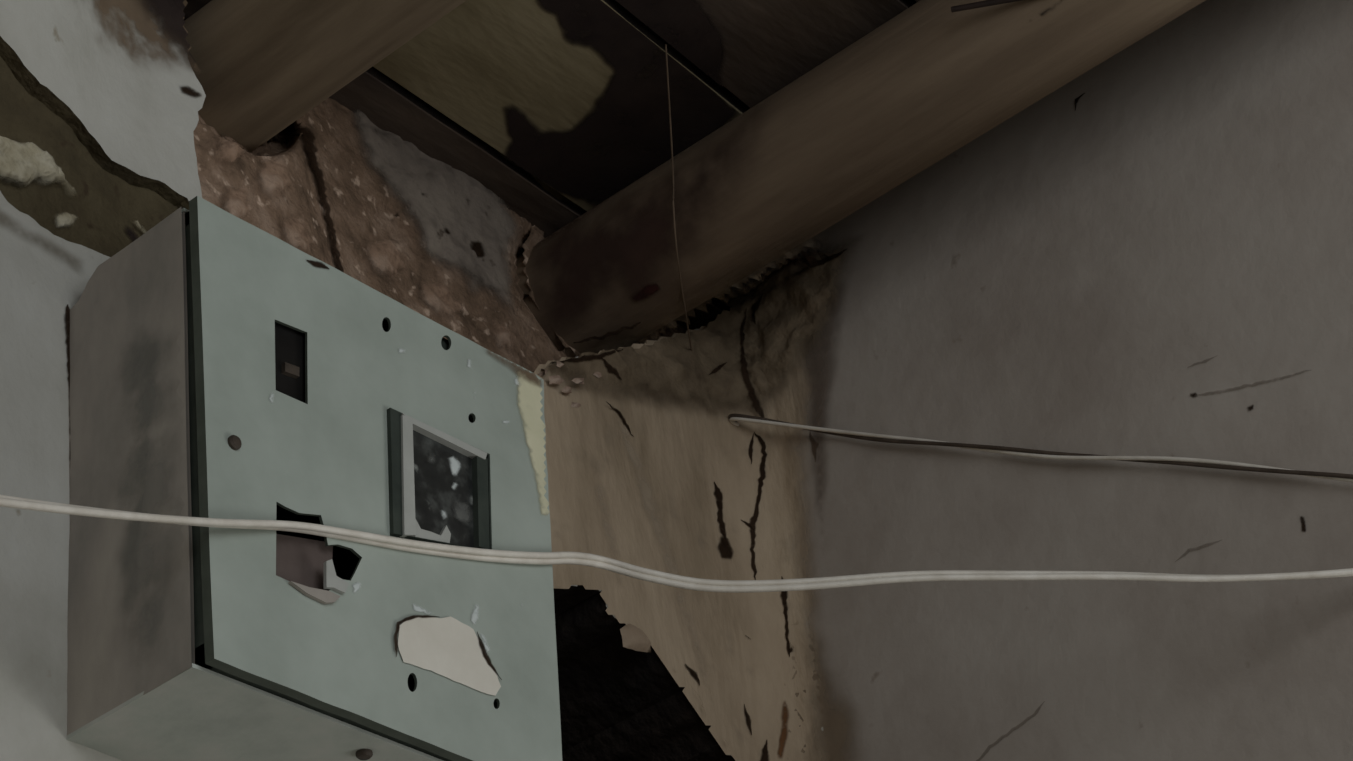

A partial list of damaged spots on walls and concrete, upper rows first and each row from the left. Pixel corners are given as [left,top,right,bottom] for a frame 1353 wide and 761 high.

flaking render [181,87,201,97]
flaking render [0,56,178,257]
crack [267,123,344,273]
spalling [471,242,485,257]
crack [714,308,793,657]
spalling [620,623,651,652]
spalling [744,704,769,761]